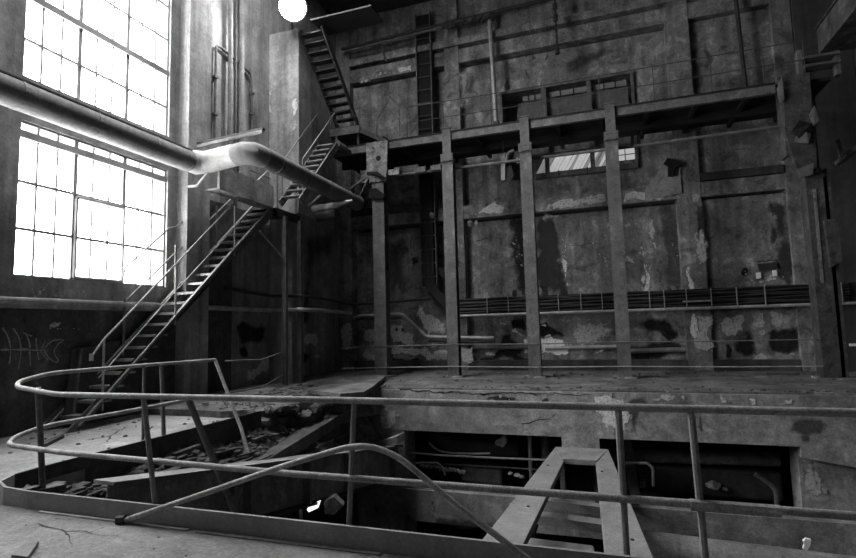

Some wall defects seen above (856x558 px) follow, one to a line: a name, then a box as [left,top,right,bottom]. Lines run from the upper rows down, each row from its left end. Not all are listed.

spalling [543,193,606,220]
spalling [624,189,672,202]
water stain [537,218,568,295]
peeling [391,323,447,360]
peeling [416,305,446,335]
peeling [541,319,613,357]
peeling [690,311,784,352]
water stain [794,420,823,441]
spalling [358,389,856,556]
crack [38,523,118,544]